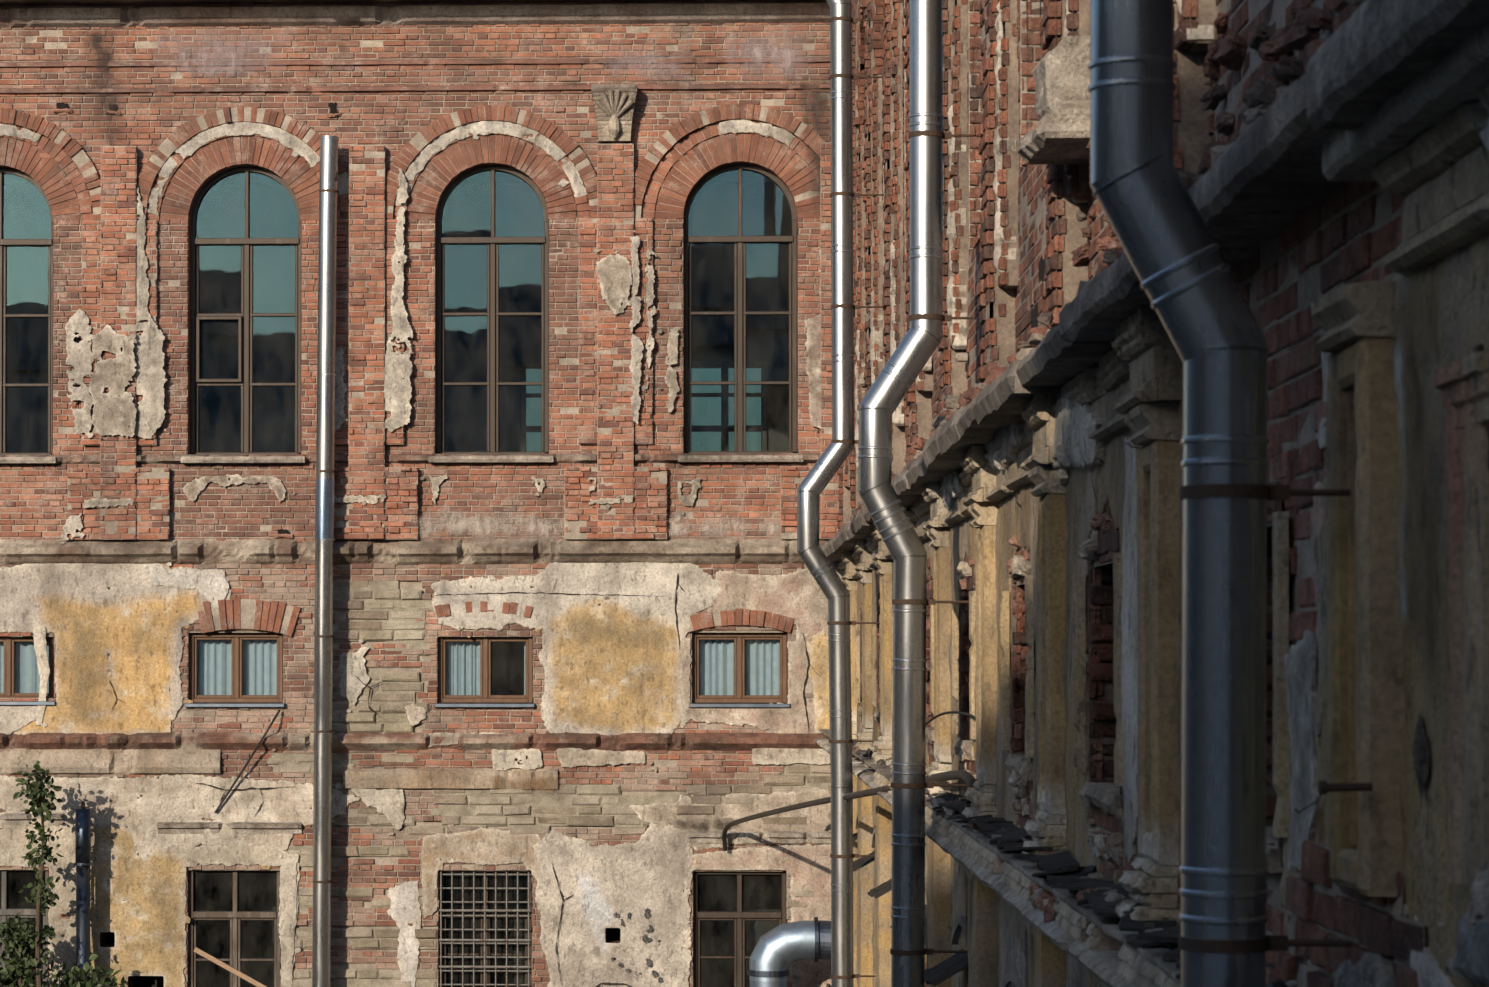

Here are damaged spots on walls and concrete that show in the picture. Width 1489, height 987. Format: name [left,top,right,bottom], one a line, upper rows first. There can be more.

flaking render [1063,0,1077,37]
flaking render [65,122,320,439]
flaking render [381,120,587,432]
flaking render [854,240,897,467]
flaking render [892,403,904,426]
flaking render [916,357,932,384]
flaking render [946,105,968,362]
flaking render [993,2,1016,273]
spalling [1038,253,1046,283]
flaking render [338,640,370,713]
flaking render [1231,181,1469,987]
flaking render [1466,862,1489,928]